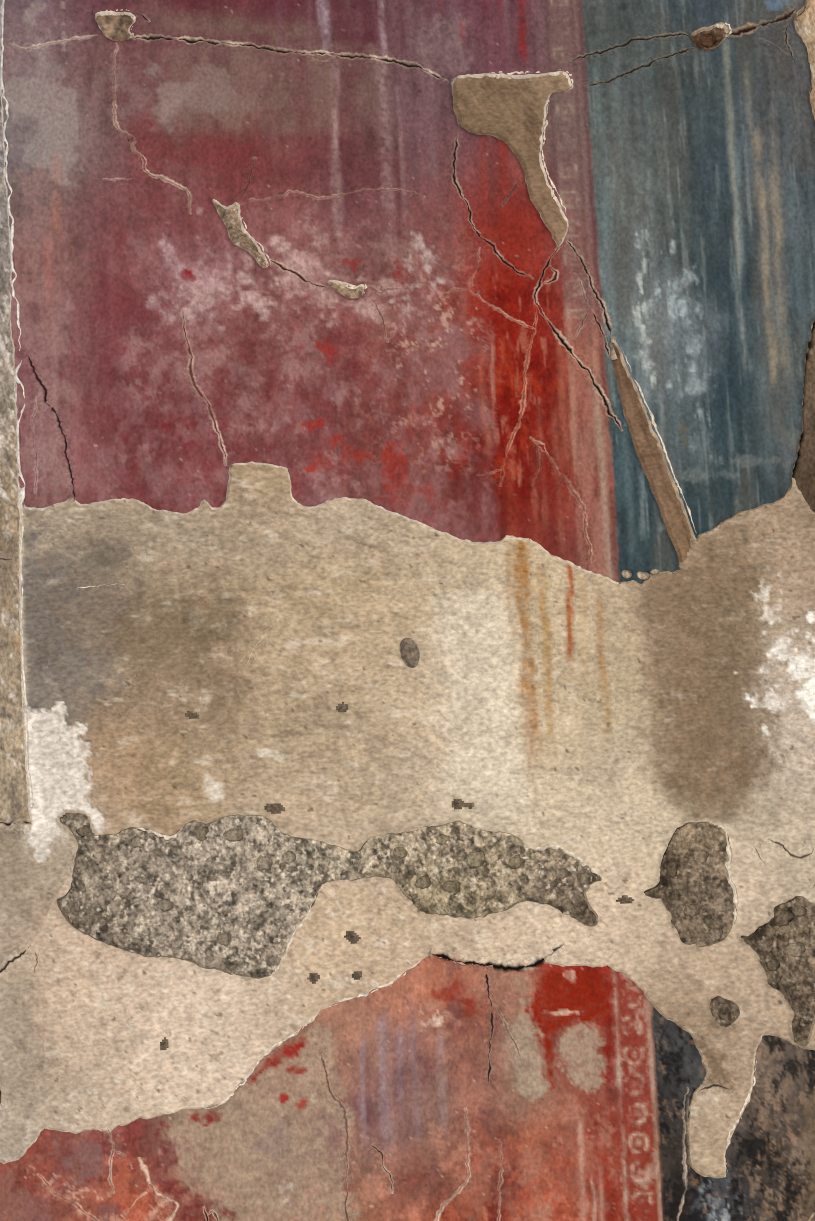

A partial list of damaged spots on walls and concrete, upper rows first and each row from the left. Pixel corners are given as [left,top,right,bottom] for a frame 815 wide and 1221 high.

crack [7,4,454,215]
crack [21,349,81,502]
spalling [0,0,601,977]
crack [236,133,626,564]
spalling [612,343,696,562]
corrosion [501,537,616,783]
water stain [621,519,815,831]
crack [32,1125,224,1221]
peeling [147,957,426,1221]
crack [428,938,568,1221]
peeling [500,966,620,1104]
spalling [644,823,815,1045]